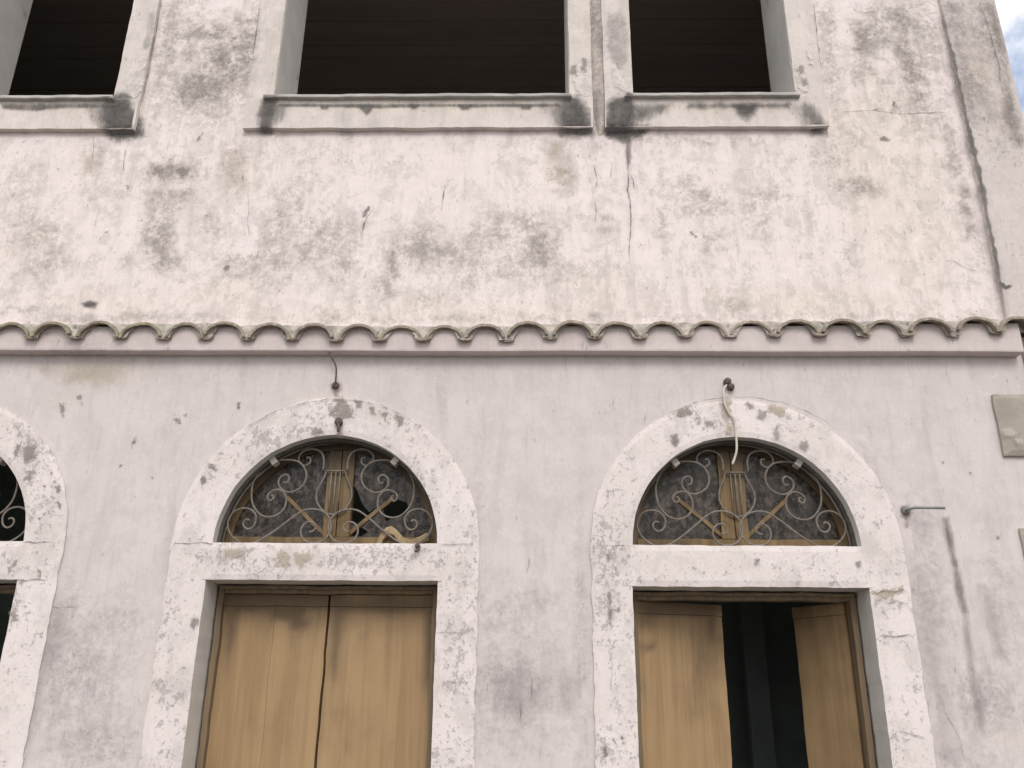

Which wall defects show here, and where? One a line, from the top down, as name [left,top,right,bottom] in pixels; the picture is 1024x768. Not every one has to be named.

damp [3,94,143,140]
crack [594,143,634,251]
crack [933,12,1011,292]